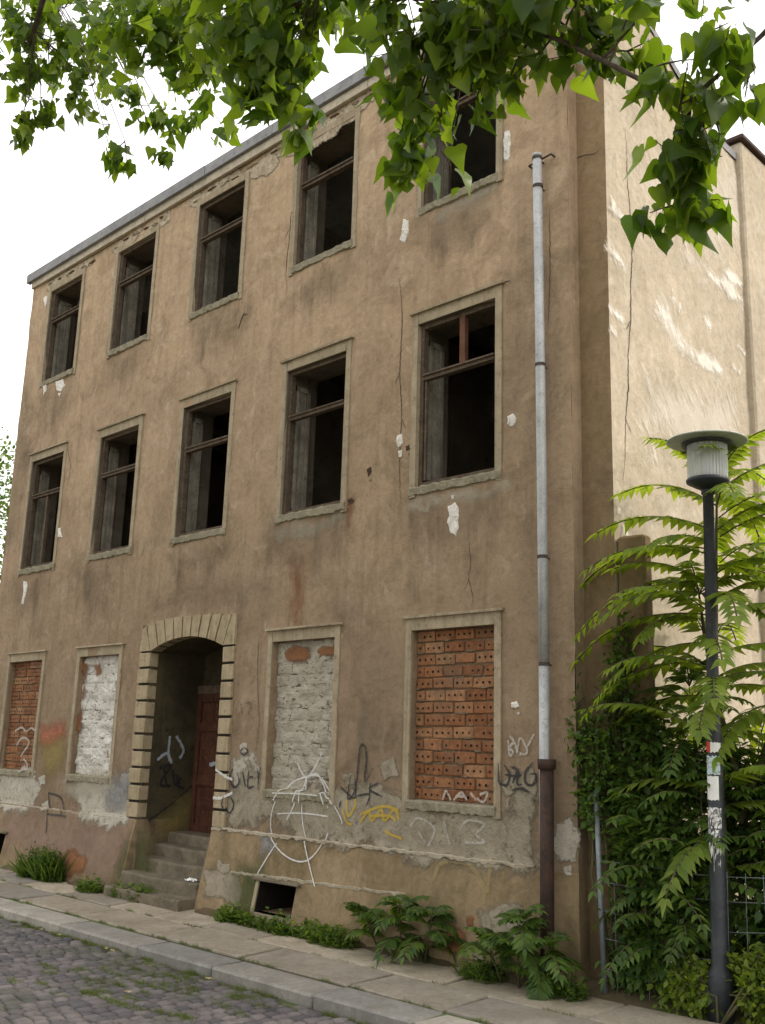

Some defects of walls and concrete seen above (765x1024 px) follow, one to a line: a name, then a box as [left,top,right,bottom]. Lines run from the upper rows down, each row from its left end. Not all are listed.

spalling [305,89,374,149]
spalling [189,145,294,207]
crack [395,278,406,497]
crack [623,247,635,476]
spalling [0,765,49,815]
spalling [73,773,131,832]
spalling [222,742,540,877]
spalling [554,818,581,876]